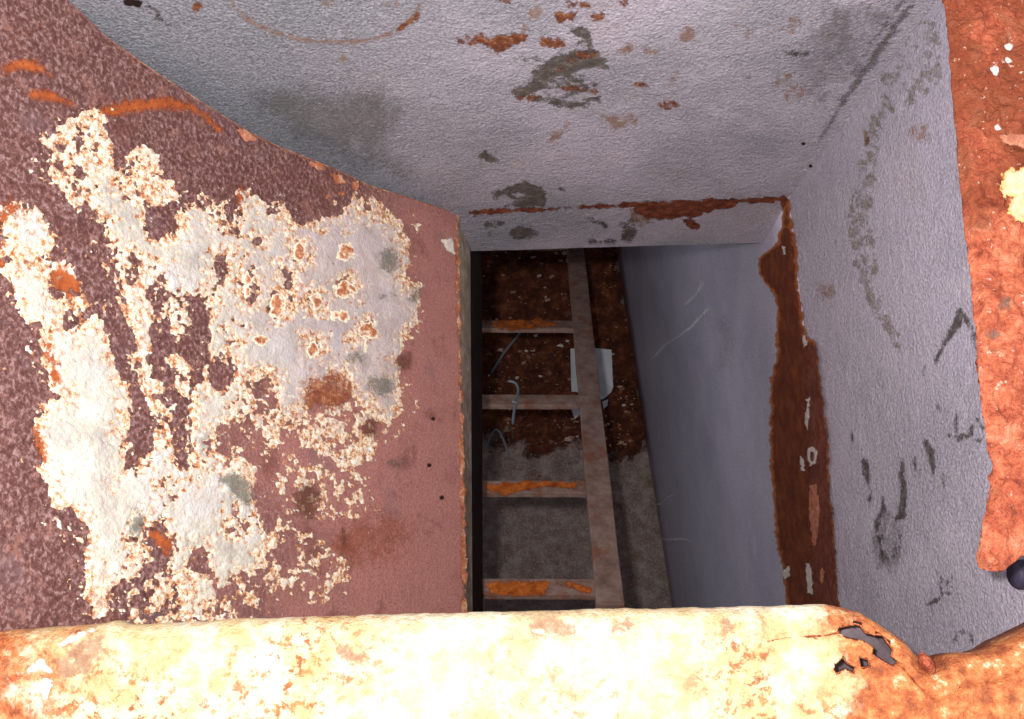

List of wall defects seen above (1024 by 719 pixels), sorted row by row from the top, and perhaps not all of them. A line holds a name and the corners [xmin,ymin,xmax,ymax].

corrosion [458,7,597,72]
corrosion [2,59,51,76]
corrosion [29,89,73,107]
corrosion [100,96,222,132]
peeling [0,107,424,647]
corrosion [758,199,840,607]
corrosion [530,615,576,639]
corrosion [612,616,633,633]
corrosion [56,634,109,678]
corrosion [337,646,363,665]
peeling [27,659,53,700]